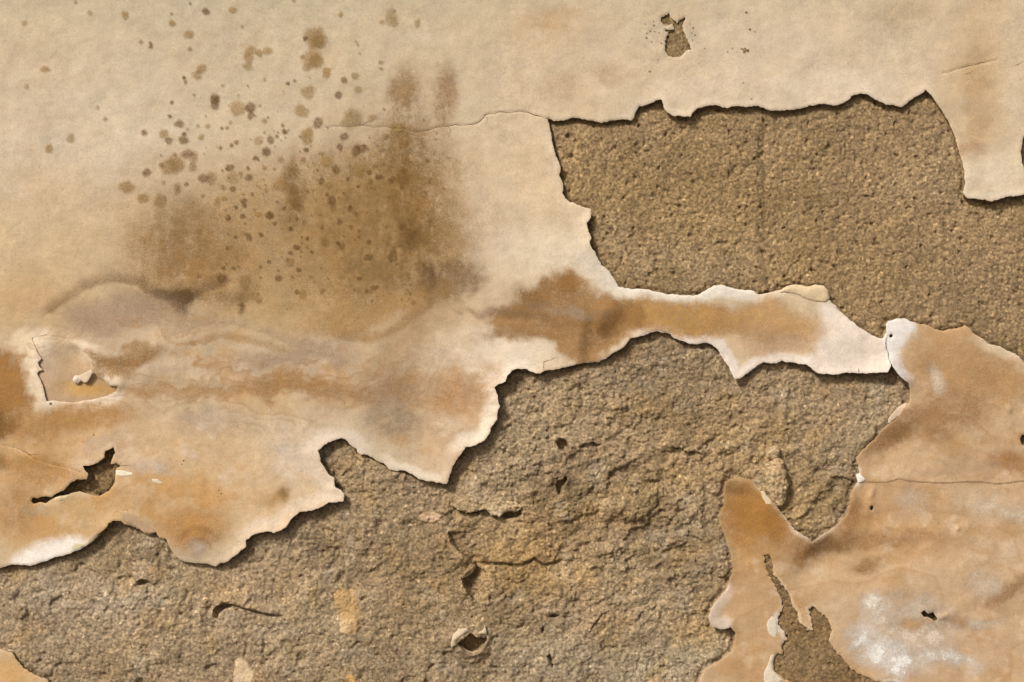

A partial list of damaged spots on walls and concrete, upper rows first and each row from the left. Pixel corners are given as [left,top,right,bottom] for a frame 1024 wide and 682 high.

damp [300,30,330,93]
spalling [645,14,706,60]
damp [143,101,233,182]
damp [298,109,328,152]
damp [80,123,477,332]
flaking render [548,90,1024,362]
damp [0,353,117,437]
damp [89,341,155,381]
flaking render [0,331,910,682]
damp [852,593,992,676]